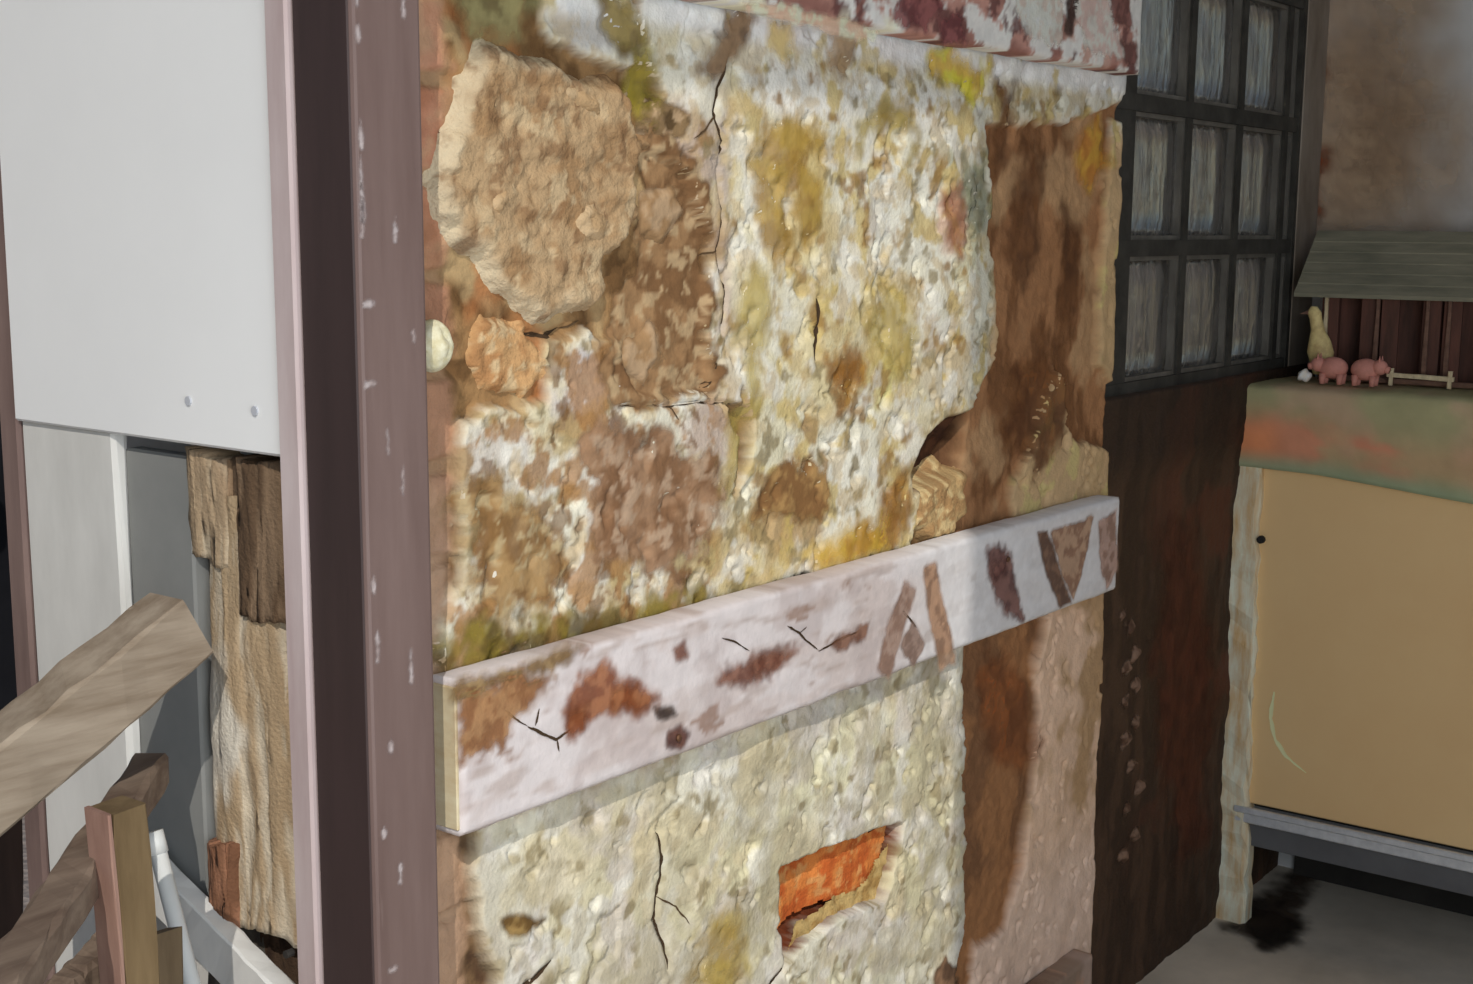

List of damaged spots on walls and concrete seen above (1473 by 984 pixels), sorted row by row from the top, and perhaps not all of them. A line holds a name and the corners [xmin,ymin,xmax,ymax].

crack [694,66,726,155]
water stain [929,47,1012,165]
water stain [1319,0,1418,220]
water stain [1060,207,1081,327]
spalling [577,96,728,583]
crack [622,363,730,420]
water stain [1003,359,1066,471]
spalling [911,415,967,543]
peeling [879,563,955,679]
crack [651,833,689,969]
spalling [777,826,888,949]
crack [523,960,551,984]